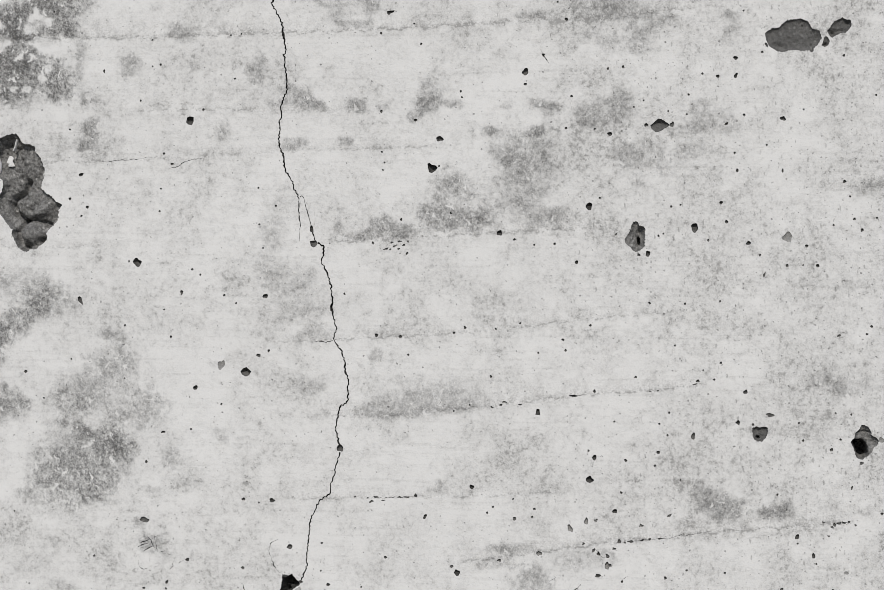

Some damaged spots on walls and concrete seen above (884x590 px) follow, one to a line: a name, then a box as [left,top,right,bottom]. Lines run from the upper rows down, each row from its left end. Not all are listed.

spalling [765,17,852,52]
spalling [0,133,62,252]
spalling [625,221,650,257]
crack [271,0,349,580]
spalling [851,425,884,465]
spalling [280,574,303,590]